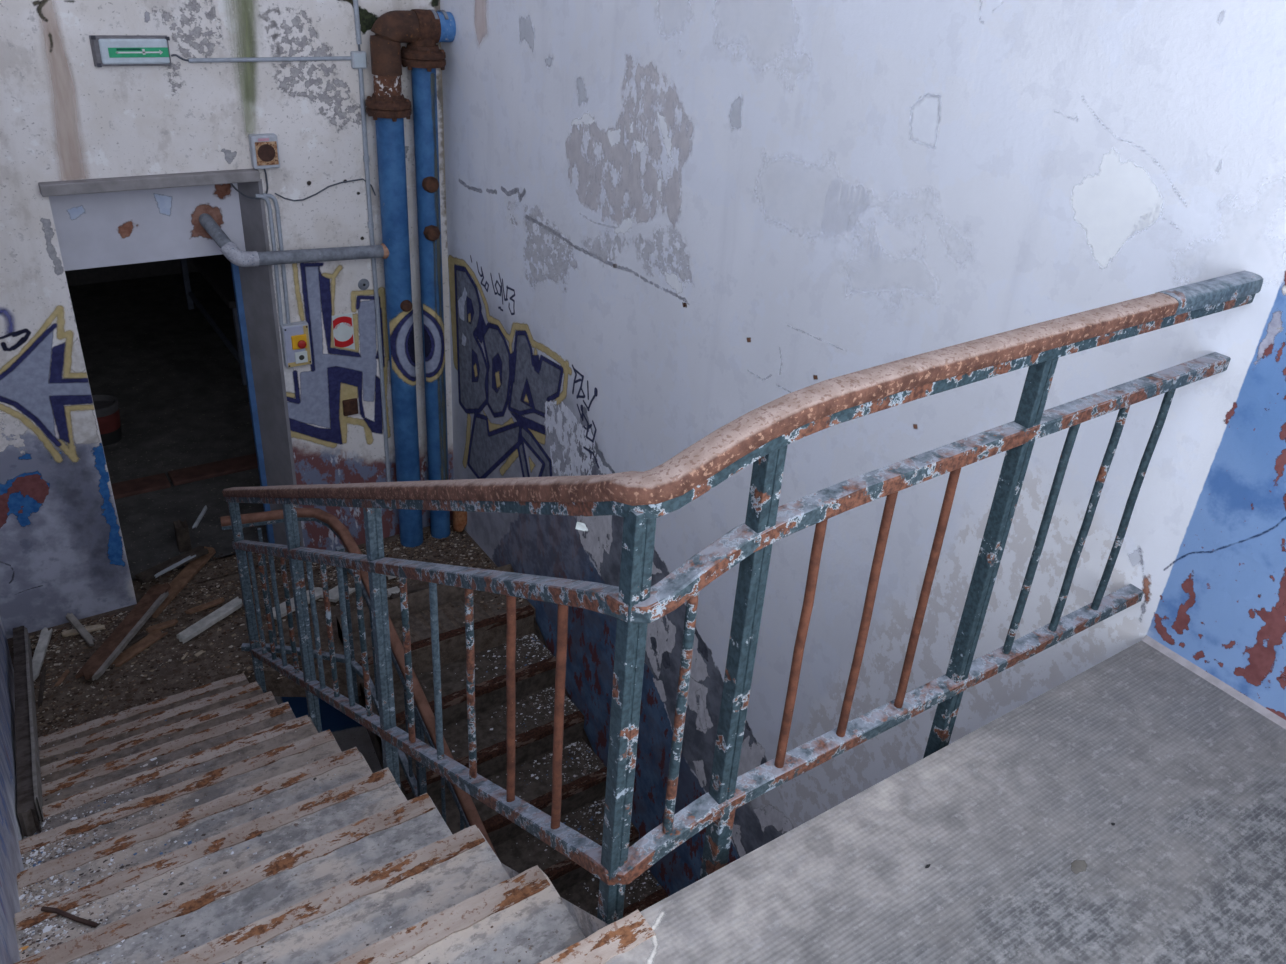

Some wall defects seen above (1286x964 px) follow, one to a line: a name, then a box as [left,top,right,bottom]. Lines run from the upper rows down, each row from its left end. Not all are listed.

rust [33,0,84,180]
peeling [145,0,222,92]
water stain [232,0,253,132]
peeling [259,5,361,131]
spalling [509,56,693,294]
peeling [1179,182,1286,295]
peeling [0,413,50,528]
peeling [70,409,126,567]
peeling [577,515,613,574]
crack [1129,517,1286,619]
peeling [1273,422,1286,510]
peeling [1154,568,1286,695]